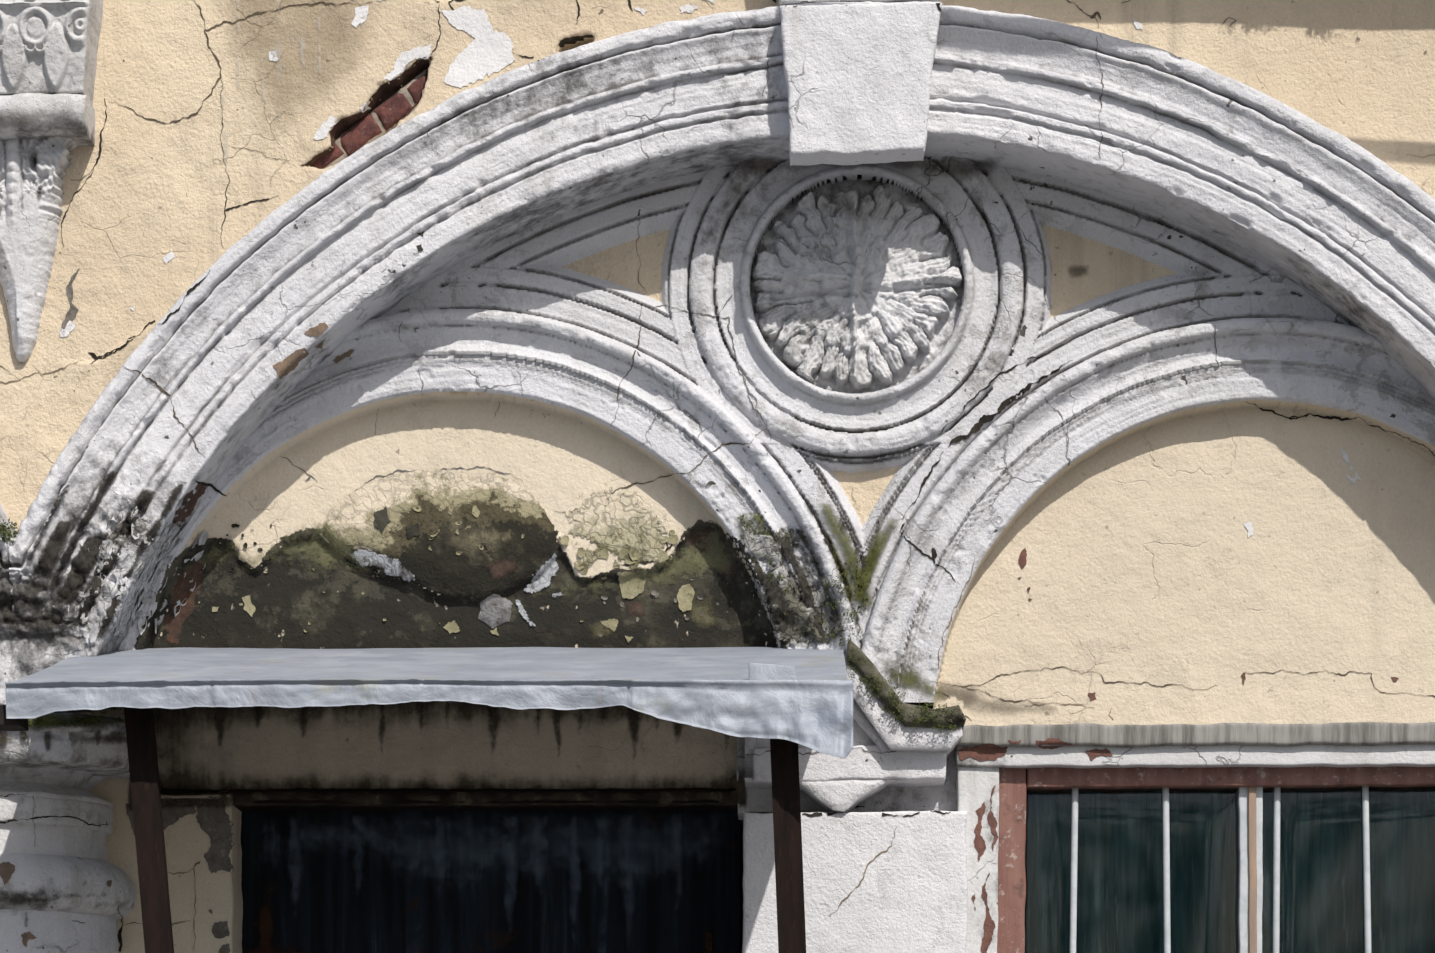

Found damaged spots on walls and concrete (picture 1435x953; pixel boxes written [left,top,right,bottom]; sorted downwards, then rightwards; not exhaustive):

crack [431,0,463,54]
peeling [442,5,516,88]
spalling [558,35,593,47]
spalling [301,43,432,169]
crack [0,1,372,496]
water stain [0,471,186,637]
water stain [639,532,730,583]
crack [899,353,1435,721]
water stain [153,701,747,808]
water stain [892,671,973,729]
crack [802,806,950,917]
peeling [972,785,998,953]